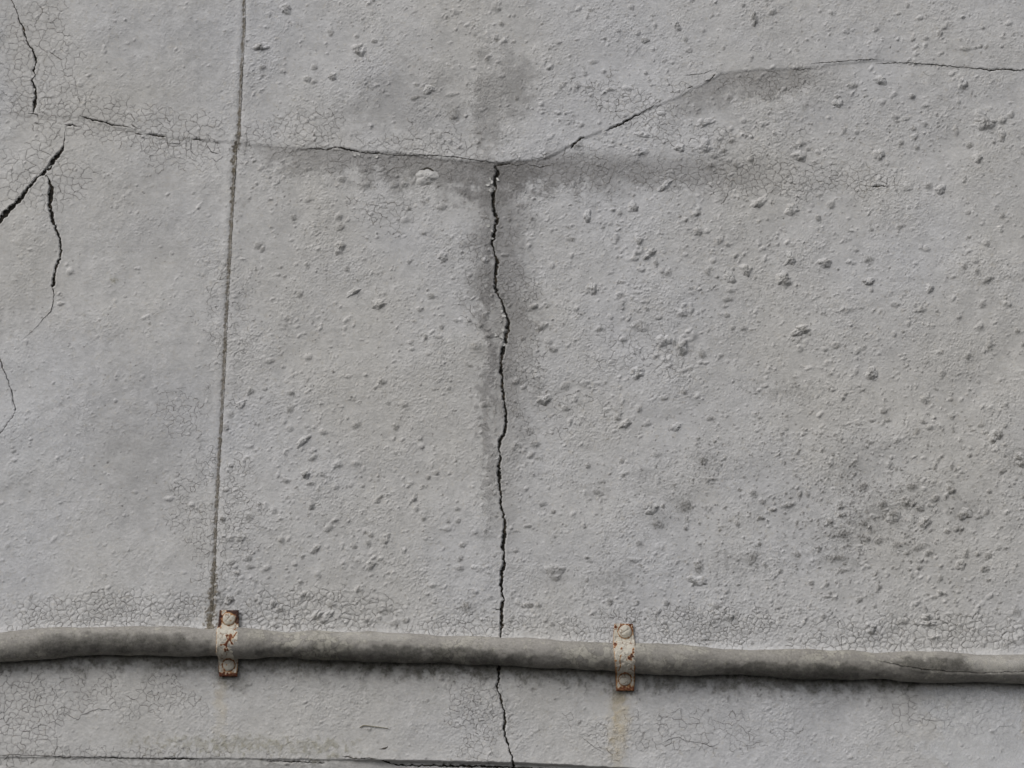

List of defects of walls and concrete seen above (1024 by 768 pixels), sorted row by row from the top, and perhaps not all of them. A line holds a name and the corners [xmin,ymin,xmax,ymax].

crack [0,0,224,333]
crack [0,359,16,433]
crack [5,59,1024,638]
crack [266,665,532,768]